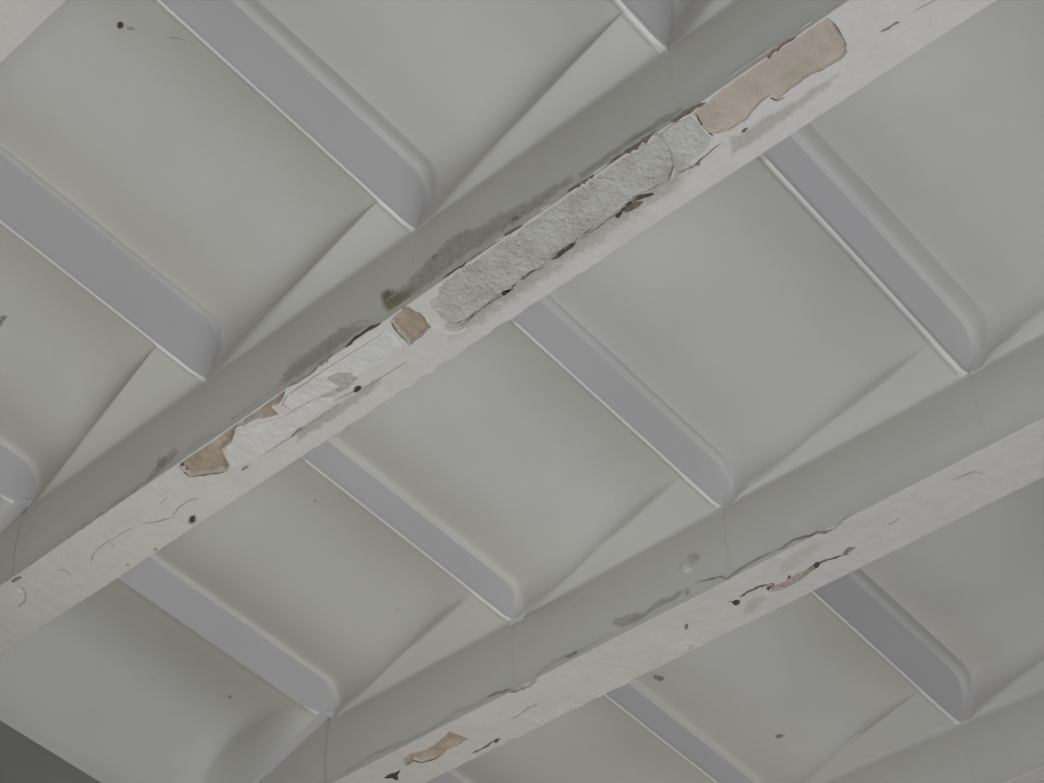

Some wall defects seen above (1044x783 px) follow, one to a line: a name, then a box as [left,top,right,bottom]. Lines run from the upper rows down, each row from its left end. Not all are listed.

peeling [179,18,847,477]
crack [695,514,856,613]
flaking render [384,731,465,780]
crack [342,637,604,774]